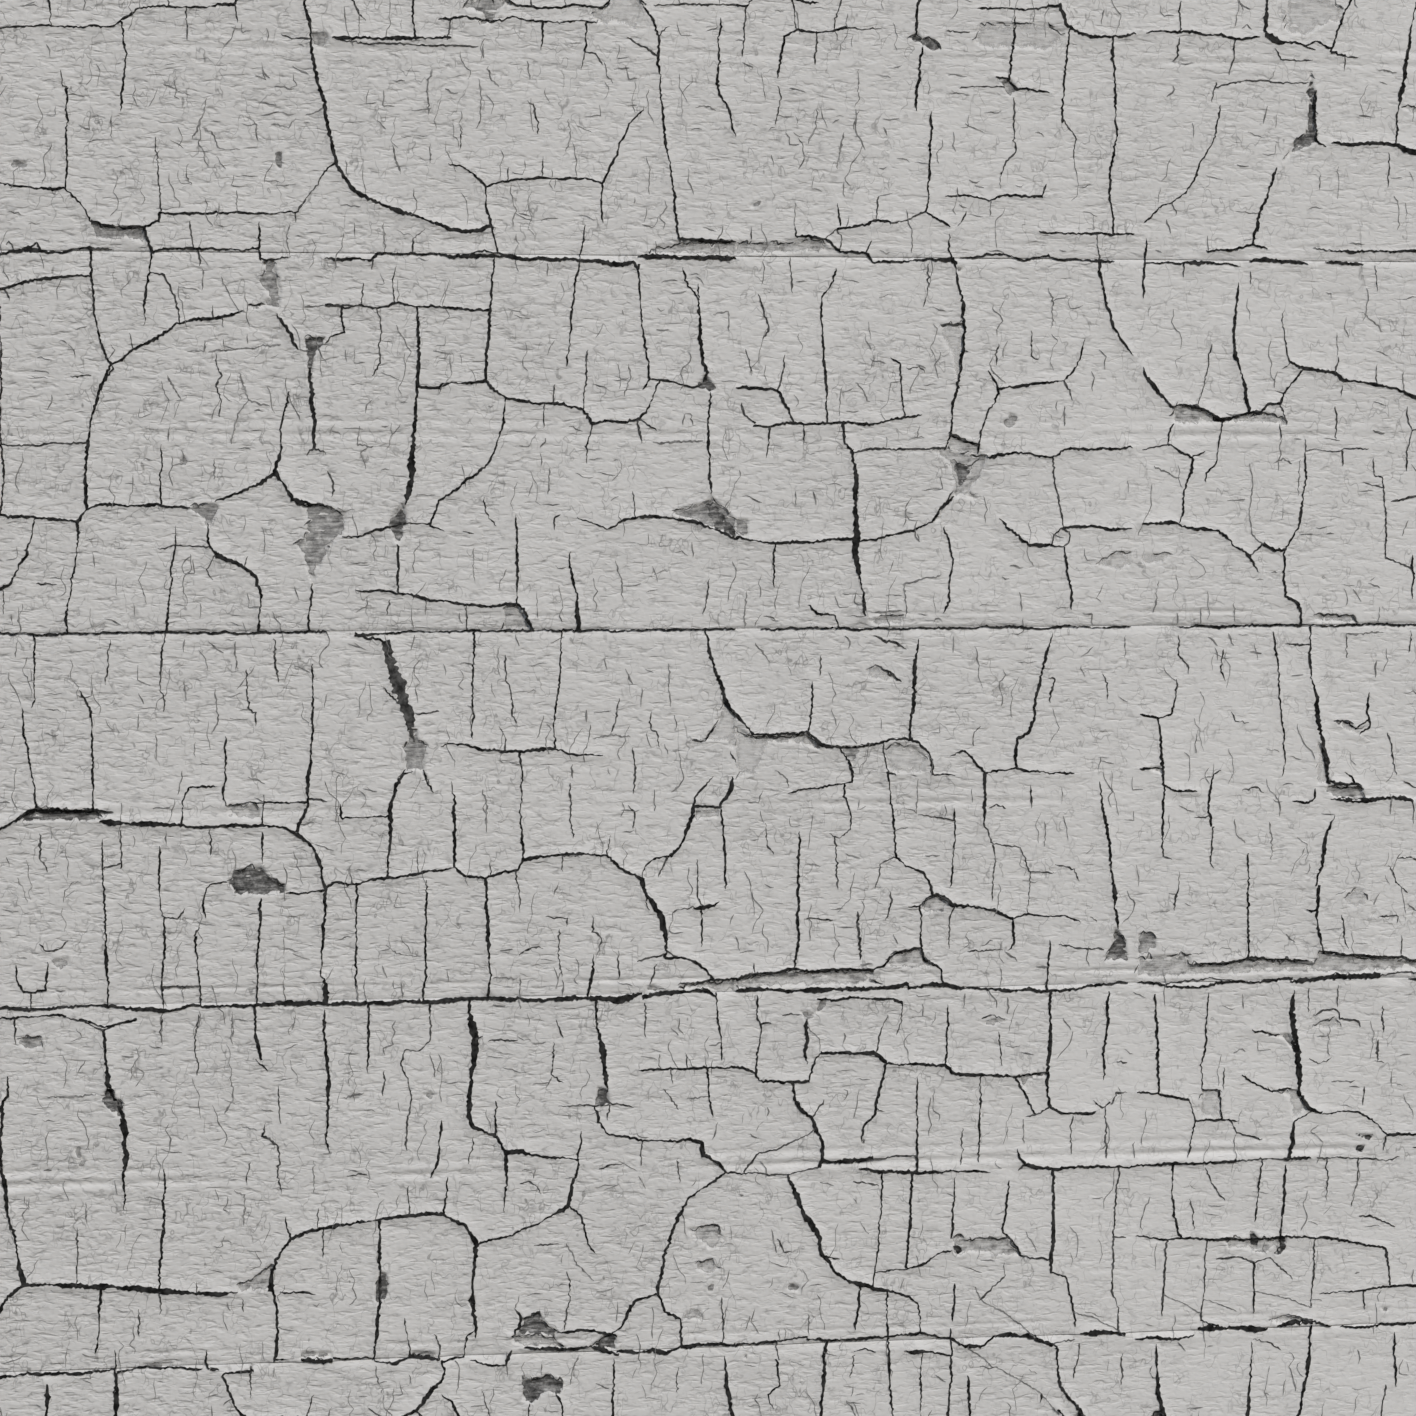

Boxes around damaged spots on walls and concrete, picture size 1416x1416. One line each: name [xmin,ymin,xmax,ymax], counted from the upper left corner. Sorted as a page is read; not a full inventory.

crack [0,0,736,711]
crack [577,0,1416,824]
peeling [293,502,344,576]
peeling [672,498,748,537]
peeling [229,863,285,895]
crack [0,517,1416,1416]
peeling [514,1309,564,1348]
peeling [522,1374,563,1403]